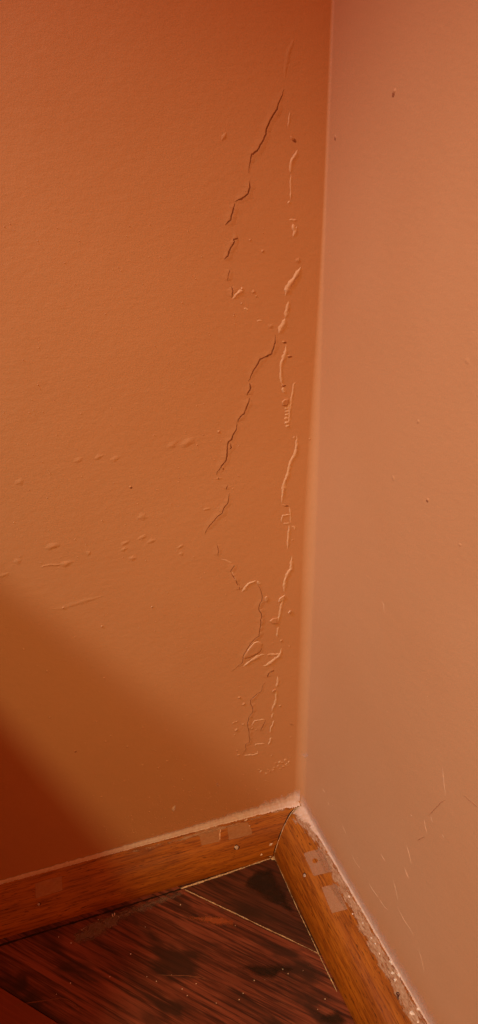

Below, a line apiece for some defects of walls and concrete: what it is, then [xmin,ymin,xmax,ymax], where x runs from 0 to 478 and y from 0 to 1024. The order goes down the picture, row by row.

crack [221,88,285,261]
crack [202,335,280,534]